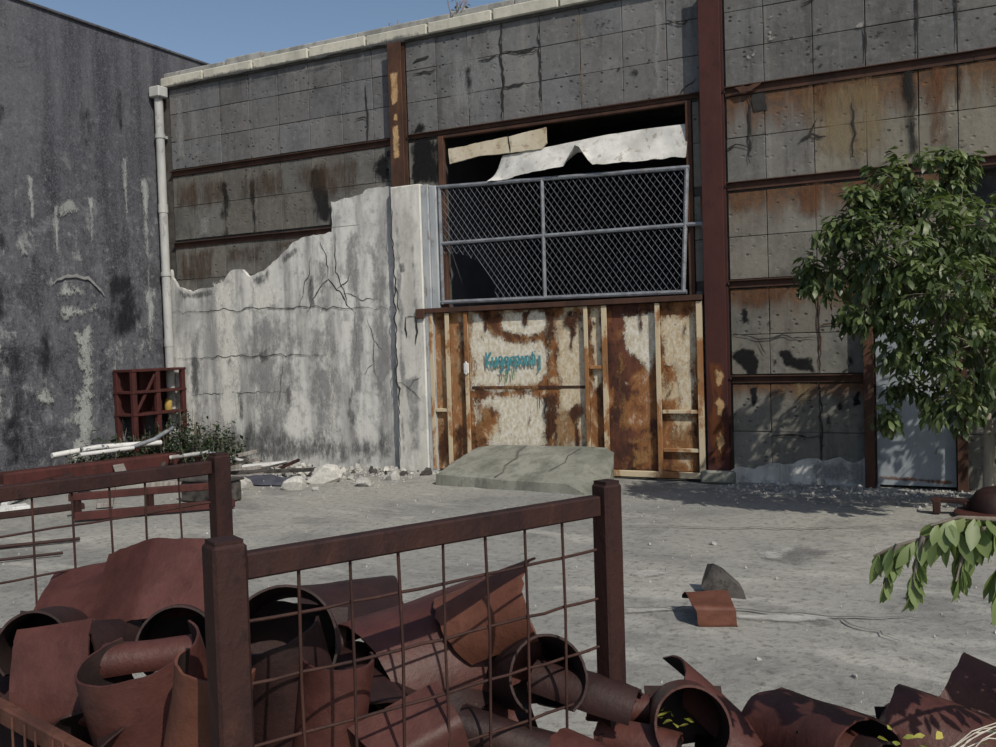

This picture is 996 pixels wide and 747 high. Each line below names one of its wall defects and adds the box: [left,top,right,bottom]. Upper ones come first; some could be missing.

crack [799,118,826,141]
crack [849,102,857,157]
damp [108,178,155,335]
damp [3,397,28,464]
crack [175,192,421,459]
corrosion [458,322,466,399]
corrosion [439,404,491,461]
crack [494,445,527,477]
corrosion [479,310,584,446]
corrosion [629,434,655,467]
corrosion [664,366,698,469]
corrosion [709,362,726,463]